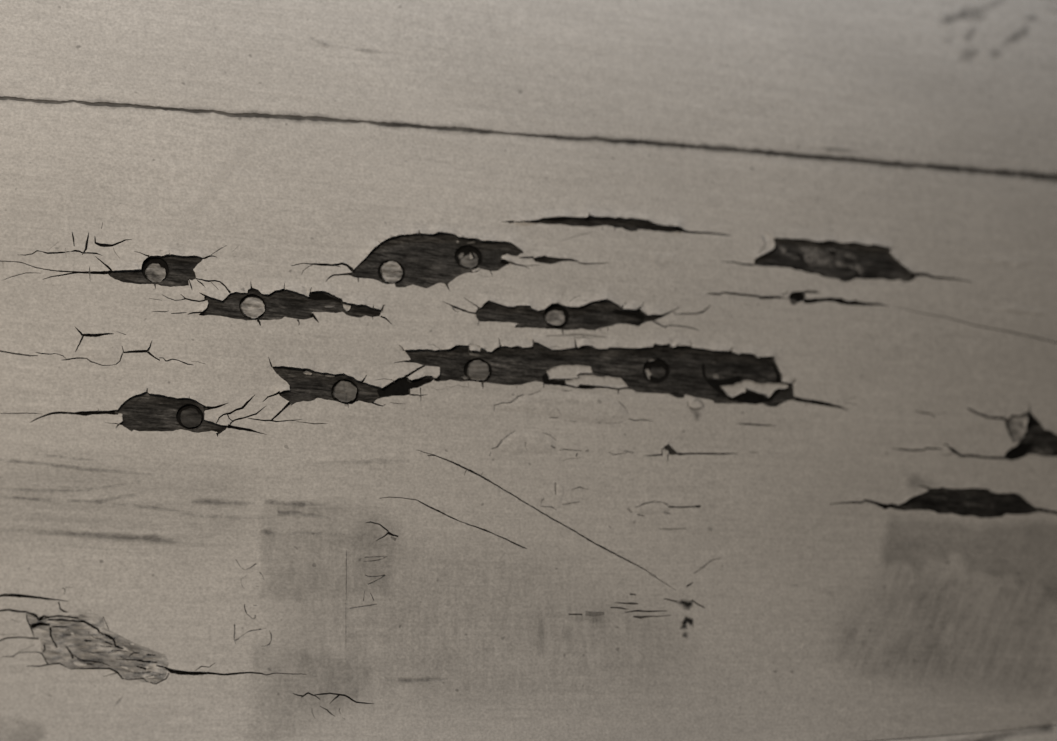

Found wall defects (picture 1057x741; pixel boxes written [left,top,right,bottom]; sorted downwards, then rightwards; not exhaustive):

peeling [527,217,729,242]
peeling [721,232,972,283]
crack [0,327,204,366]
peeling [0,222,856,437]
crack [709,290,1057,343]
peeling [644,442,757,462]
peeling [891,402,1057,463]
crack [366,522,398,541]
crack [384,497,527,549]
crack [418,449,721,619]
peeling [833,486,1057,518]
crack [0,587,372,719]